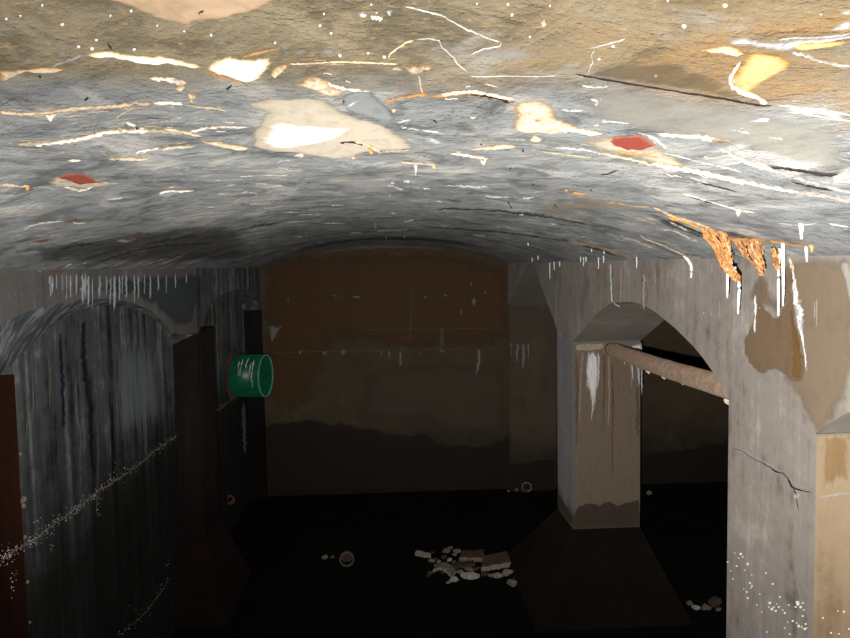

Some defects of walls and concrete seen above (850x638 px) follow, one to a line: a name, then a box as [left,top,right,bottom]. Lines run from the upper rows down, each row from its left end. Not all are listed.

spalling [202,46,287,84]
peeling [250,73,412,158]
crack [384,6,557,113]
spalling [514,101,601,136]
peeling [576,46,835,164]
damp [38,235,210,323]
corrosion [605,201,711,236]
corrosion [716,231,809,248]
damp [734,245,850,430]
damp [0,323,177,598]
damp [265,342,728,528]
crack [730,445,813,511]